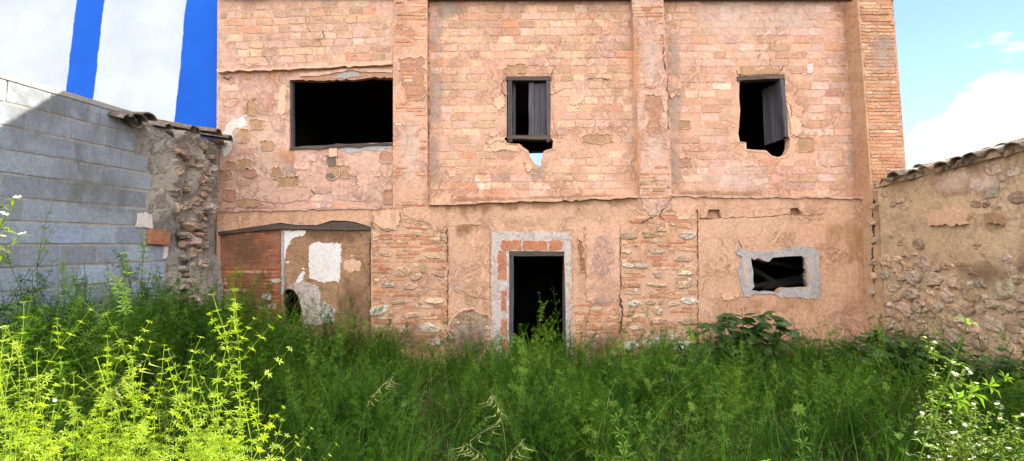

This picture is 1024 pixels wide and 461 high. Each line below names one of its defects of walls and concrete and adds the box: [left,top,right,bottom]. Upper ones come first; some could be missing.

crack [637,21,669,130]
flaking render [486,137,556,175]
peeling [284,230,365,327]
crack [868,195,879,305]